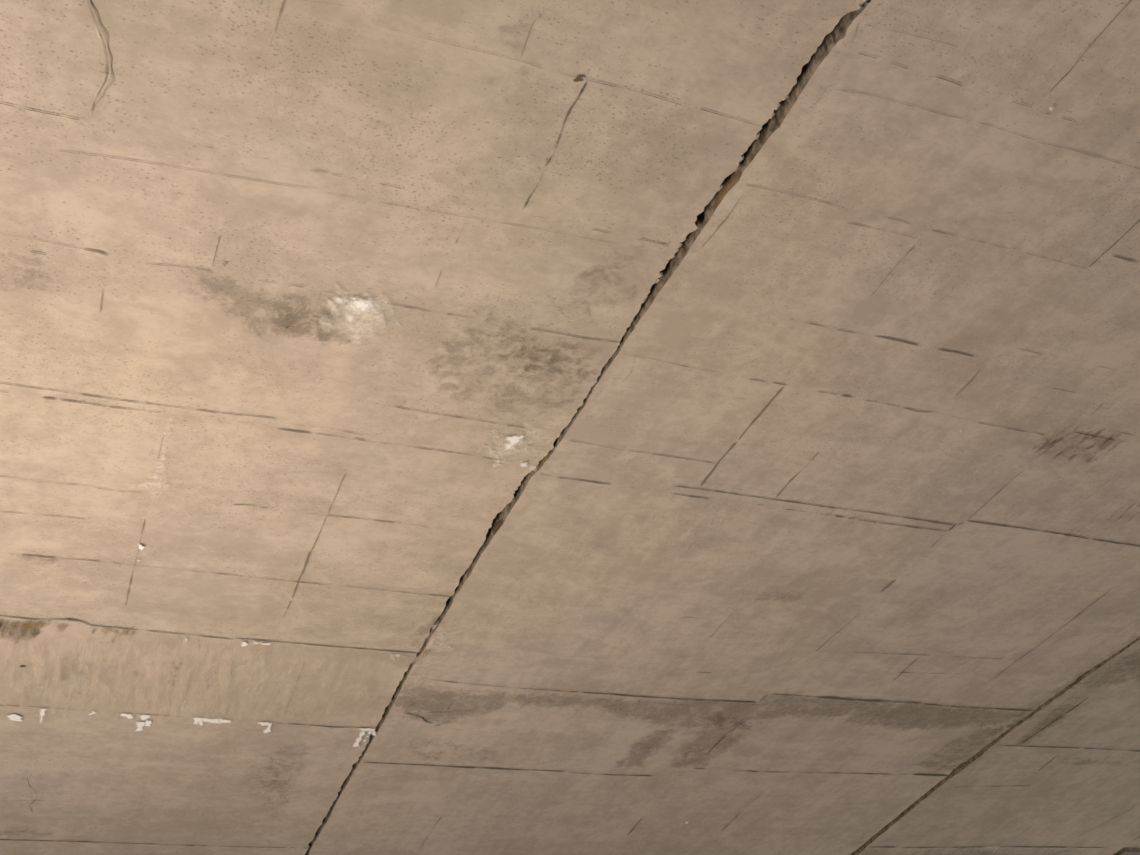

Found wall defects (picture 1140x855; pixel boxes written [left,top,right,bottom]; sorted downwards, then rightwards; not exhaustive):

water stain [326,298,387,339]
crack [0,0,907,855]
crack [675,486,1140,547]
crack [818,637,1140,855]